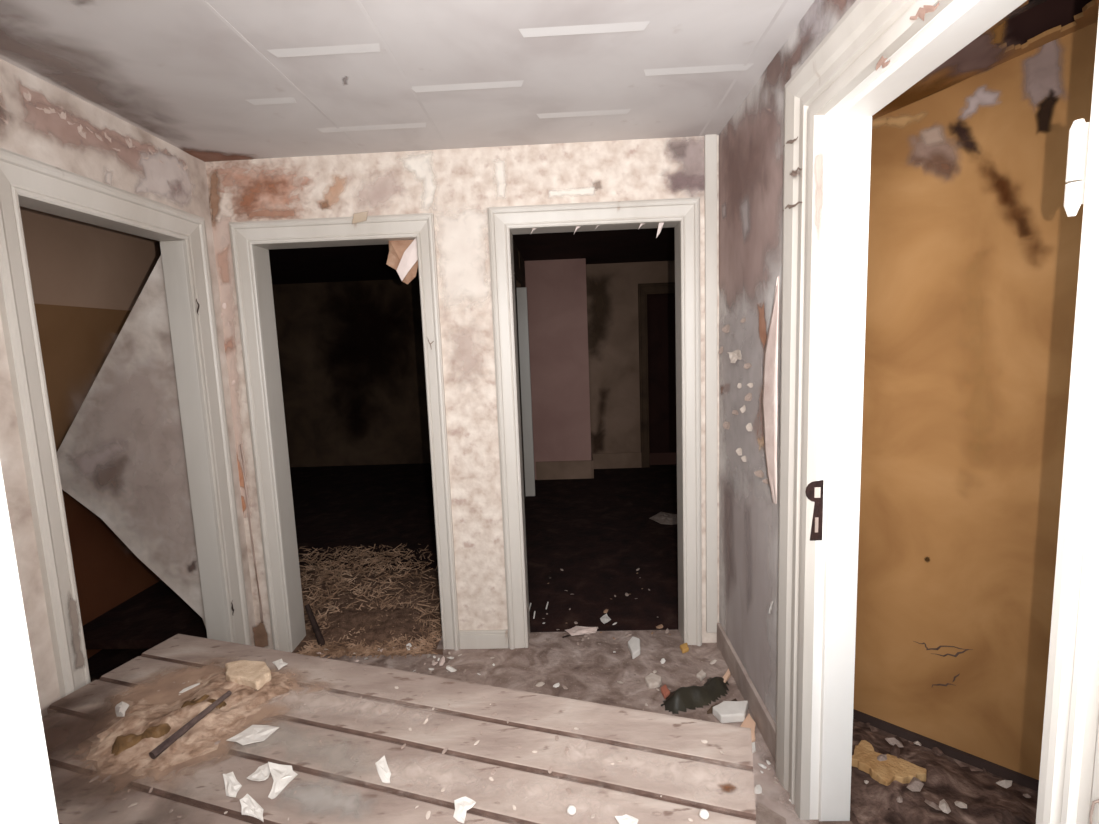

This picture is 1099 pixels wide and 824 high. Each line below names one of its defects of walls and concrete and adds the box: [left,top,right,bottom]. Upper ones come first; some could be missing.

peeling [801,0,824,35]
peeling [19,82,192,205]
leakage [885,84,951,109]
leakage [951,122,977,151]
leakage [989,172,1038,253]
peeling [718,276,779,504]